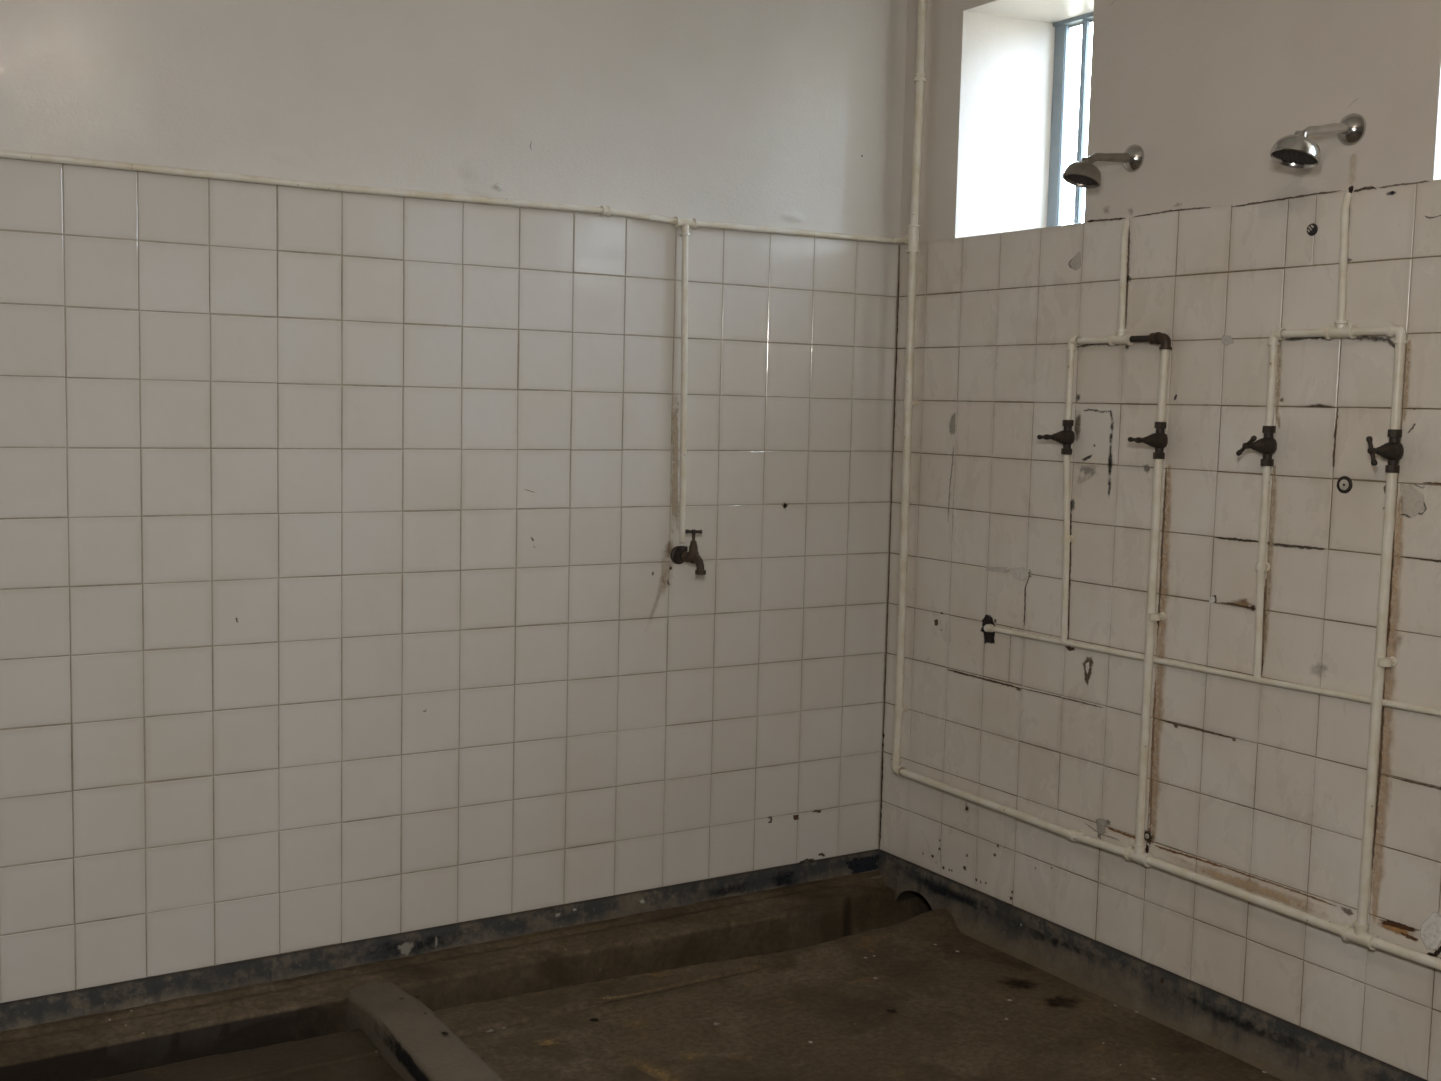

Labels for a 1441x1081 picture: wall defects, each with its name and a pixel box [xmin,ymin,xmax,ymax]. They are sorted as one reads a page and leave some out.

corrosion [1157,467,1167,637]
corrosion [1372,686,1385,867]